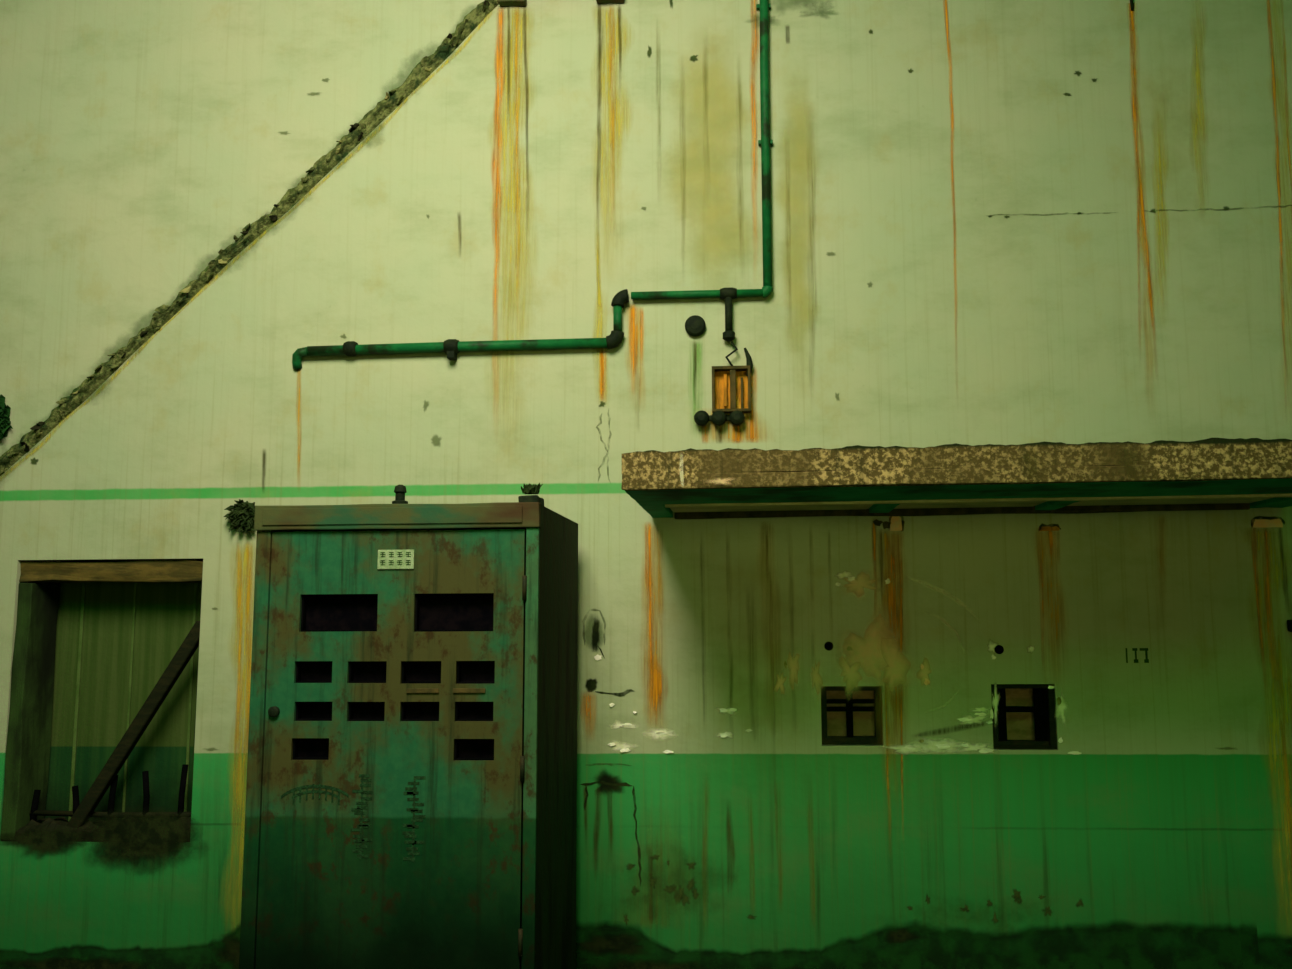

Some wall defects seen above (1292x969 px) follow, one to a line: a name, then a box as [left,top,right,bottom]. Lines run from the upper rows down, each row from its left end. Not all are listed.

rust [493,10,528,300]
rust [598,8,626,178]
rust [1138,169,1153,320]
rust [1276,134,1291,264]
rust [648,527,662,709]
rust [233,548,251,879]
water stain [576,895,1292,969]